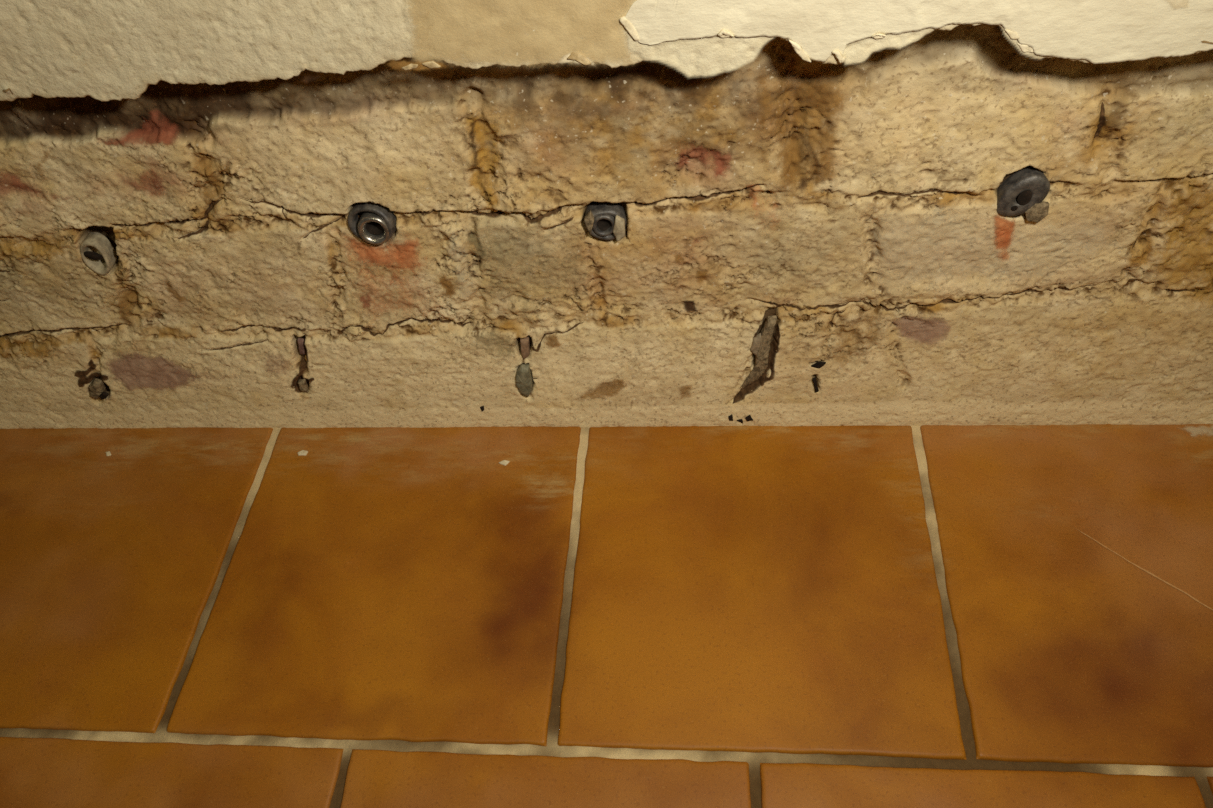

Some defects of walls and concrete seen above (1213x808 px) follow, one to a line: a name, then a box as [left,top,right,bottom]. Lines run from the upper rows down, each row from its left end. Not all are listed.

crack [635,184,761,206]
crack [862,189,973,197]
crack [113,198,344,239]
crack [416,206,574,228]
flaking render [0,16,1213,429]
corrosion [995,216,1014,259]
crack [754,285,1094,327]
crack [0,324,122,337]
crack [210,325,278,350]
crack [341,317,513,336]
crack [538,322,583,347]